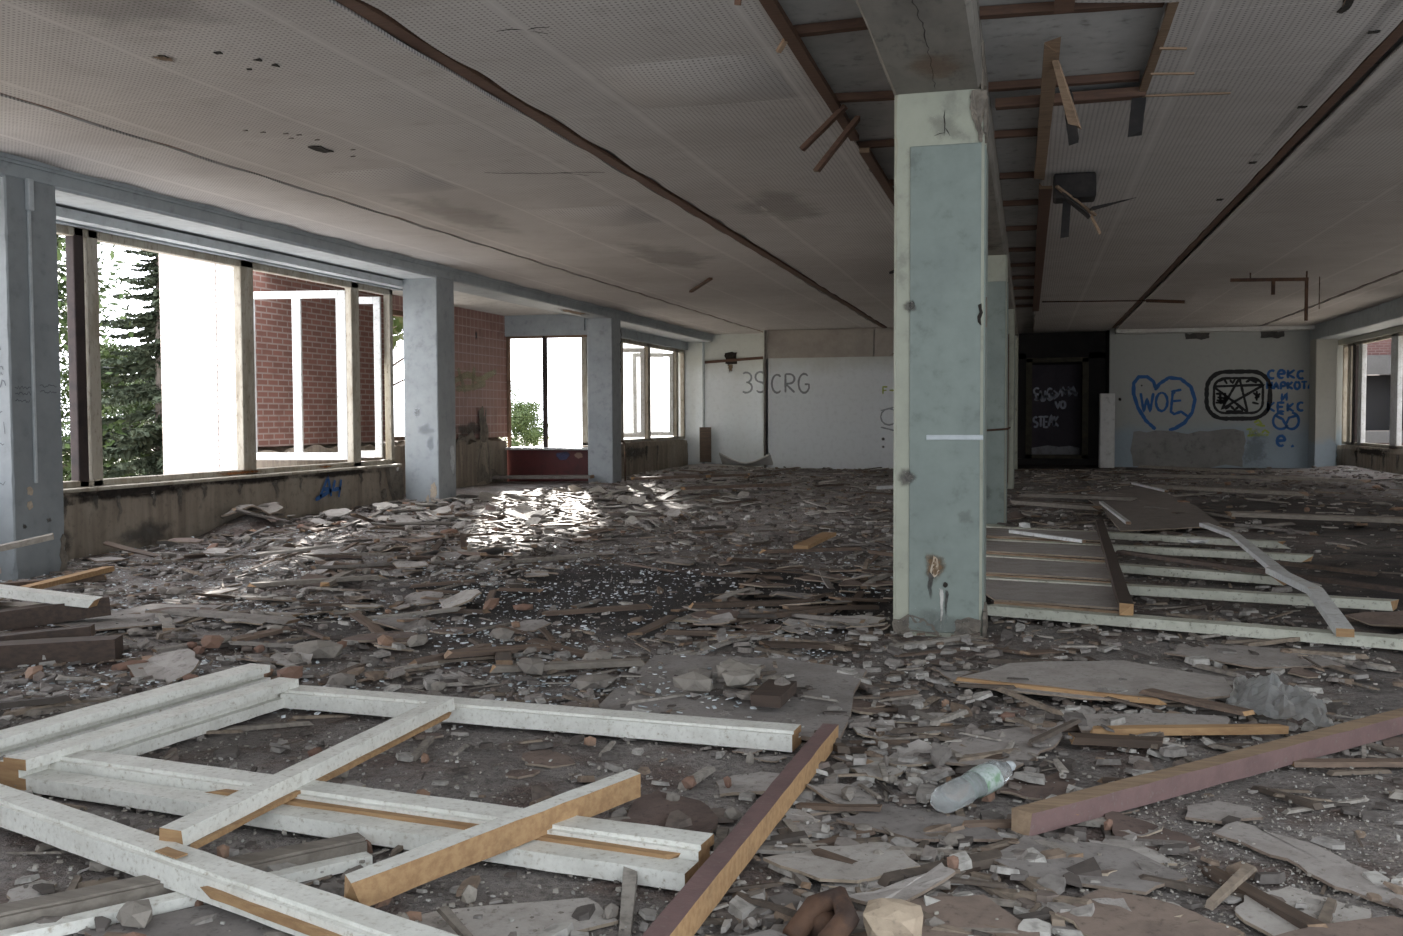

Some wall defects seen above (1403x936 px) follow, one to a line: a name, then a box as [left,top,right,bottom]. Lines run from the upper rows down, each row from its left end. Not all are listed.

spalling [970,41,989,143]